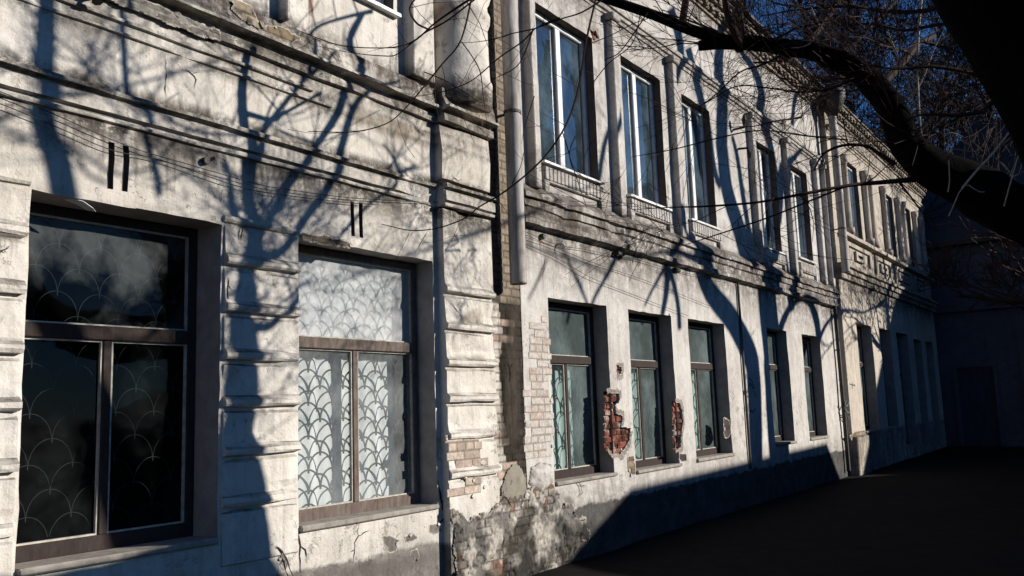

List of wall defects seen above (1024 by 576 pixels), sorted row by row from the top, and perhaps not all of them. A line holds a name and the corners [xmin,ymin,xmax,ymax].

spalling [231,0,301,44]
spalling [523,316,555,459]
spalling [603,391,636,477]
spalling [672,401,688,462]
spalling [382,435,591,576]